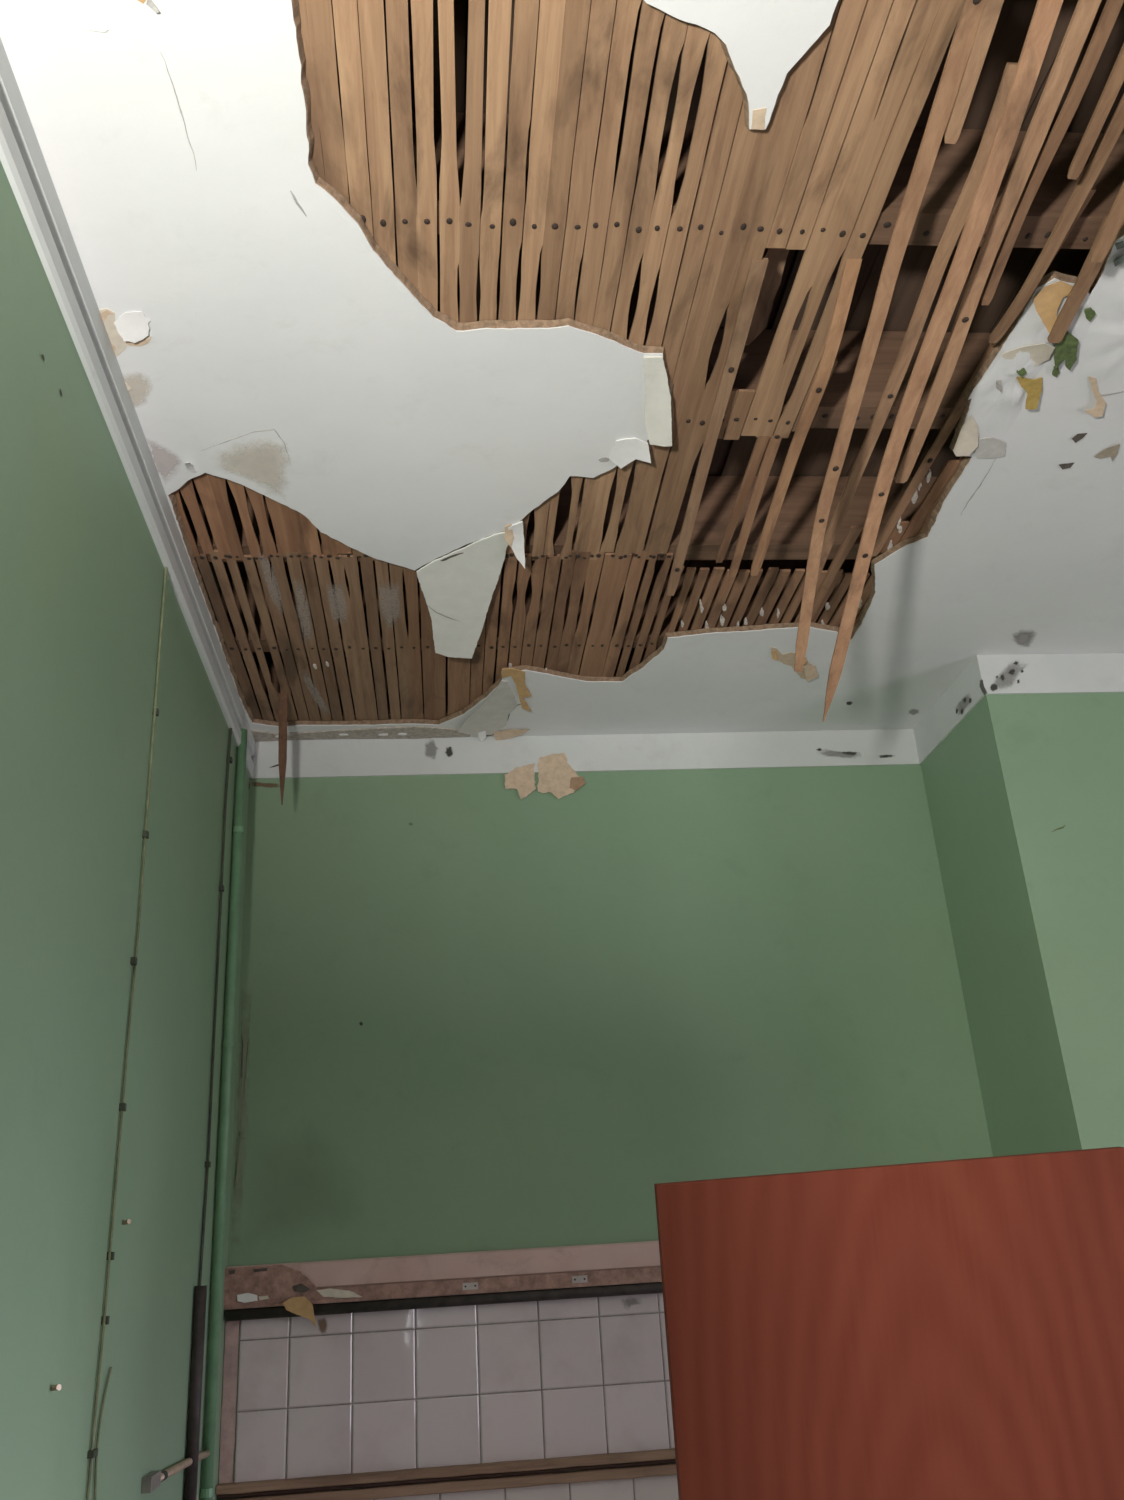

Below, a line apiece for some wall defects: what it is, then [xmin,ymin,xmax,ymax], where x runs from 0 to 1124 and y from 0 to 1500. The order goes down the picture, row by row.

peeling [138,0,159,13]
flaking render [1084,307,1096,322]
flaking render [953,281,1079,458]
flaking render [599,437,651,468]
peeling [1094,444,1120,461]
flaking render [504,521,525,568]
peeling [770,647,818,682]
flaking render [251,668,531,742]
spalling [504,753,586,799]
spalling [224,1265,362,1326]